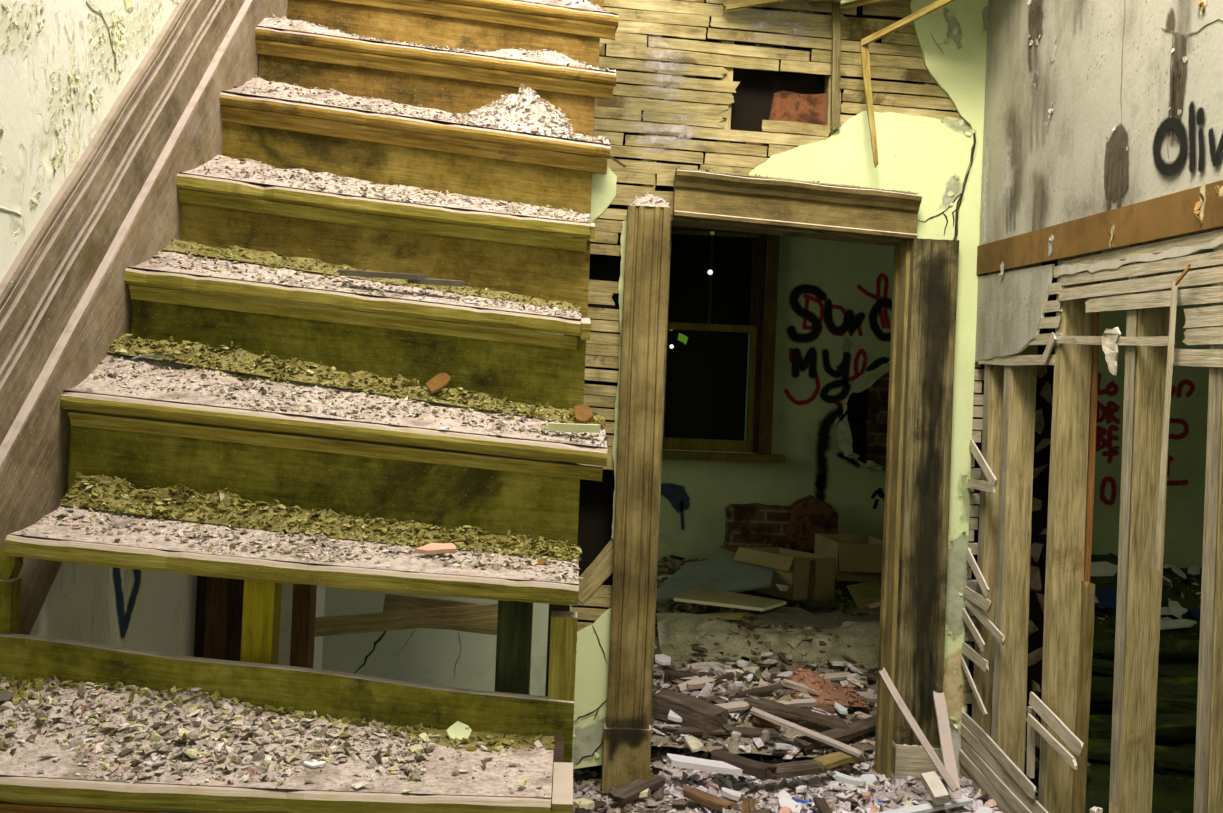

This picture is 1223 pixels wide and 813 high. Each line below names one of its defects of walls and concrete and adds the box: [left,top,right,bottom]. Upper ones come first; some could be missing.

peeling [48,0,180,172]
leakage [1027,0,1049,108]
leakage [1166,1,1188,144]
crack [1161,18,1223,90]
crack [917,132,978,271]
spalling [943,173,961,206]
leakage [1104,124,1129,211]
peeling [1193,182,1223,226]
spalling [1049,226,1223,276]
spalling [834,361,890,471]
crack [354,629,416,674]
spalling [572,718,606,765]